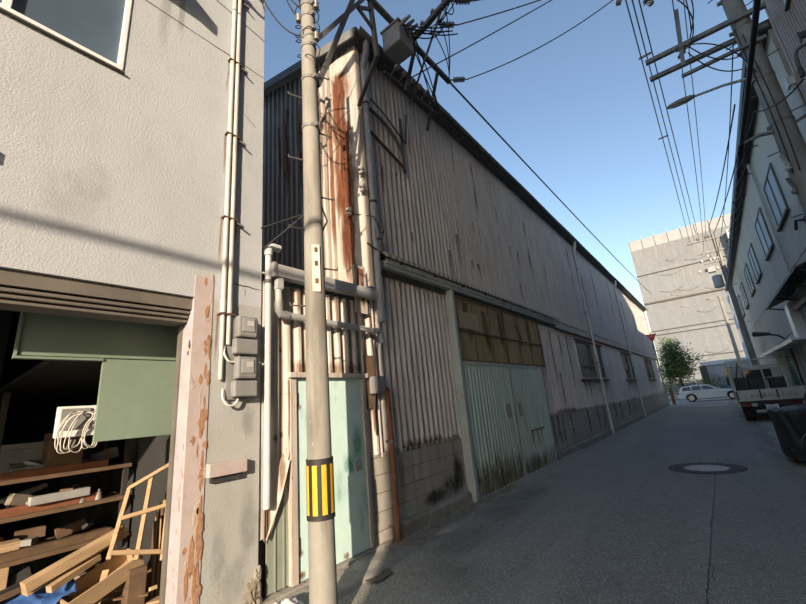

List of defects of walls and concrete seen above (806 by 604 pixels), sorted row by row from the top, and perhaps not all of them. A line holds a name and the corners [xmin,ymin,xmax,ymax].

rust [276,103,303,182]
rust [319,74,364,286]
peeling [166,334,211,604]
water stain [428,460,463,504]
water stain [478,413,574,496]
crack [706,459,718,604]
spalling [243,565,263,604]